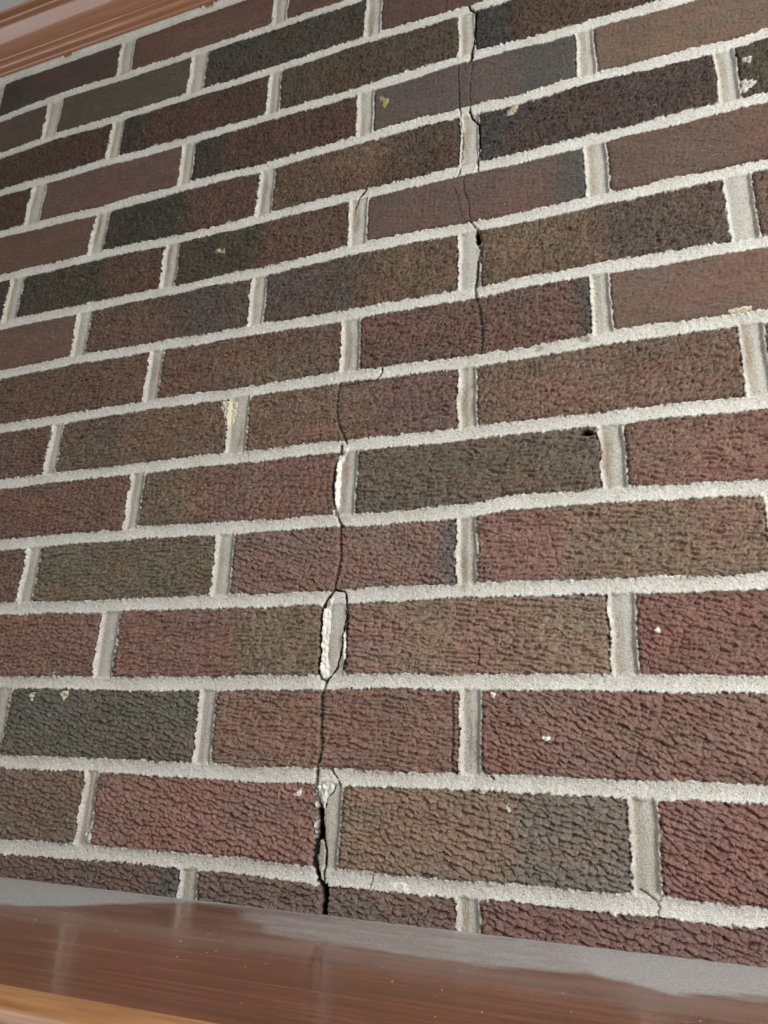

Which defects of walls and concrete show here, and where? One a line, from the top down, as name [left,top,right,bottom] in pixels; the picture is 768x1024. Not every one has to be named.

crack [445,6,483,354]
crack [313,368,383,915]